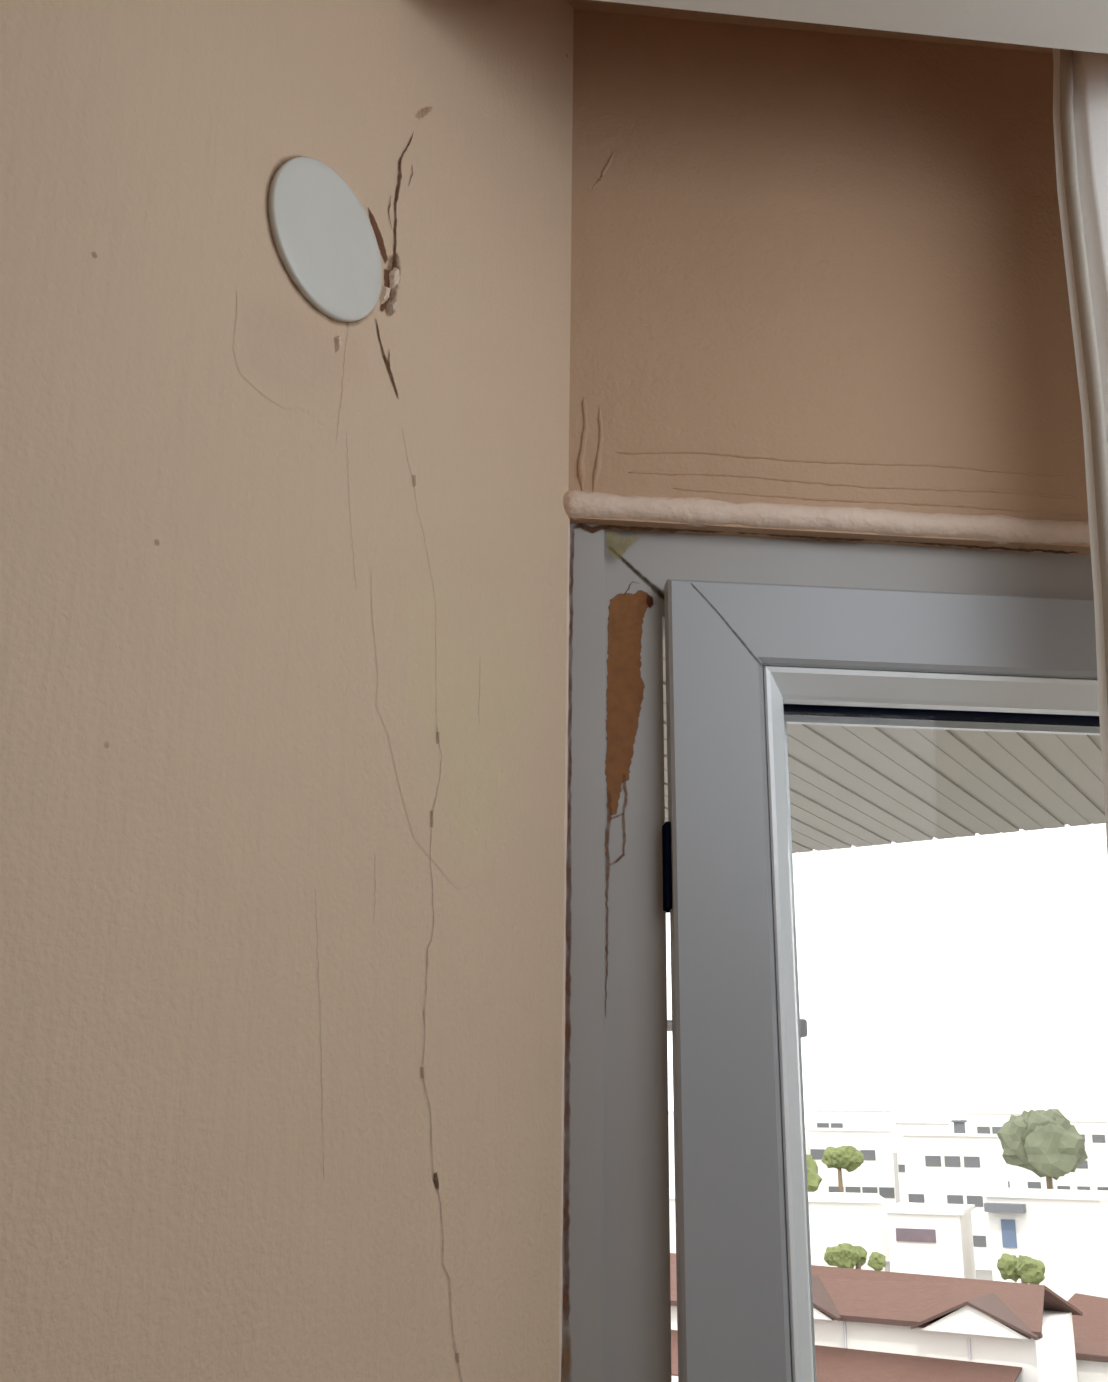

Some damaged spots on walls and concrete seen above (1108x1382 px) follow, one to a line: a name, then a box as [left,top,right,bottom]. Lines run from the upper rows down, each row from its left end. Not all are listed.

crack [388,134,413,286]
crack [376,321,398,397]
peeling [605,583,654,1012]
crack [432,1172,440,1190]